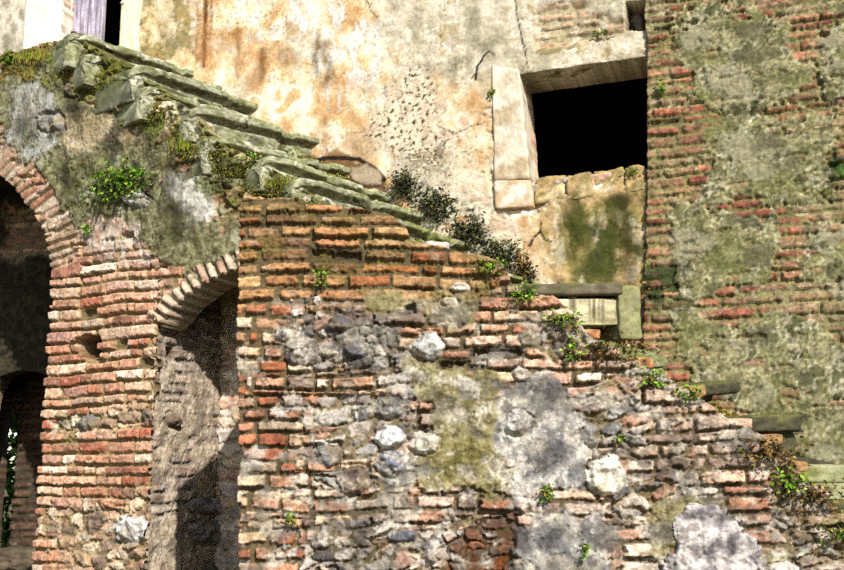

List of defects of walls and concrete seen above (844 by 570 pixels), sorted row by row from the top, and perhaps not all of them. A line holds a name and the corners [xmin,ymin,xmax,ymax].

damp [284,0,383,111]
crack [472,50,495,80]
mould [564,195,647,282]
peeling [667,0,844,464]